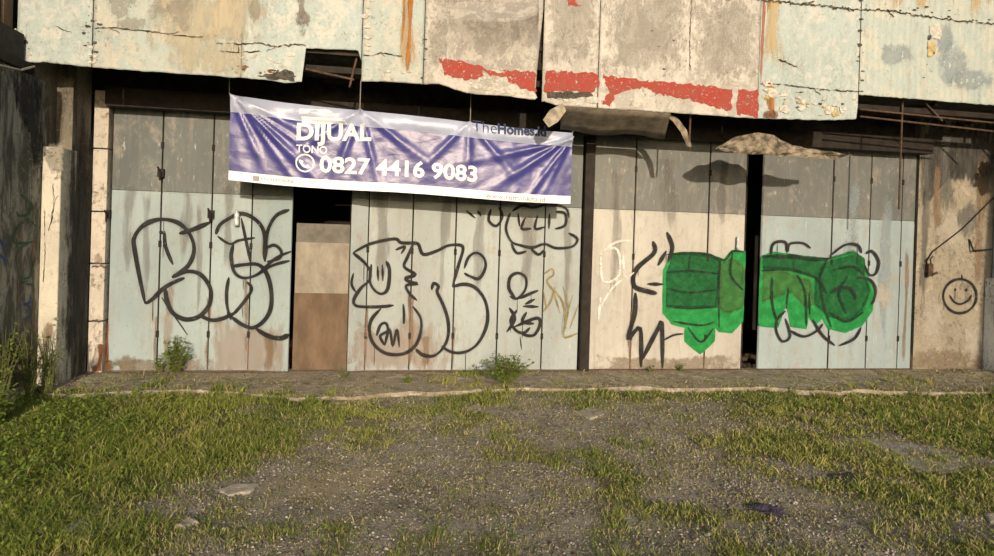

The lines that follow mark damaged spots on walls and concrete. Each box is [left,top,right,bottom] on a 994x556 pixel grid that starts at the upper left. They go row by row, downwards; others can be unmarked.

peeling [232,52,296,82]
corrosion [401,0,413,71]
peeling [439,0,865,118]
corrosion [760,0,778,74]
corrosion [764,86,778,118]
damp [903,119,994,359]
damp [0,220,37,392]
damp [878,285,891,308]
corrosion [92,324,112,372]